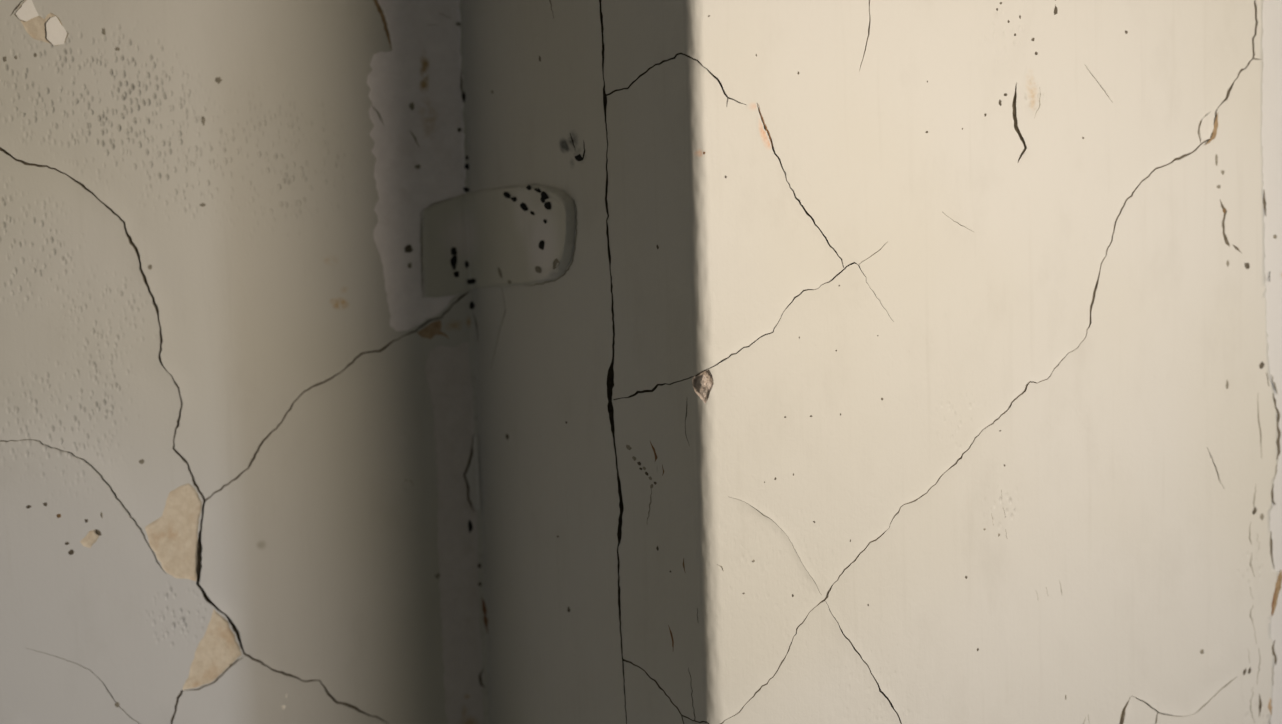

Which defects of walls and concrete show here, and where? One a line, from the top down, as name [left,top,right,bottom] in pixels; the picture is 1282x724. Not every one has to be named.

peeling [10,0,69,46]
peeling [367,0,466,331]
water stain [503,185,551,223]
water stain [558,128,588,171]
crack [606,0,1281,724]
crack [0,147,468,724]
flaking render [0,439,202,581]
flaking render [183,609,243,691]